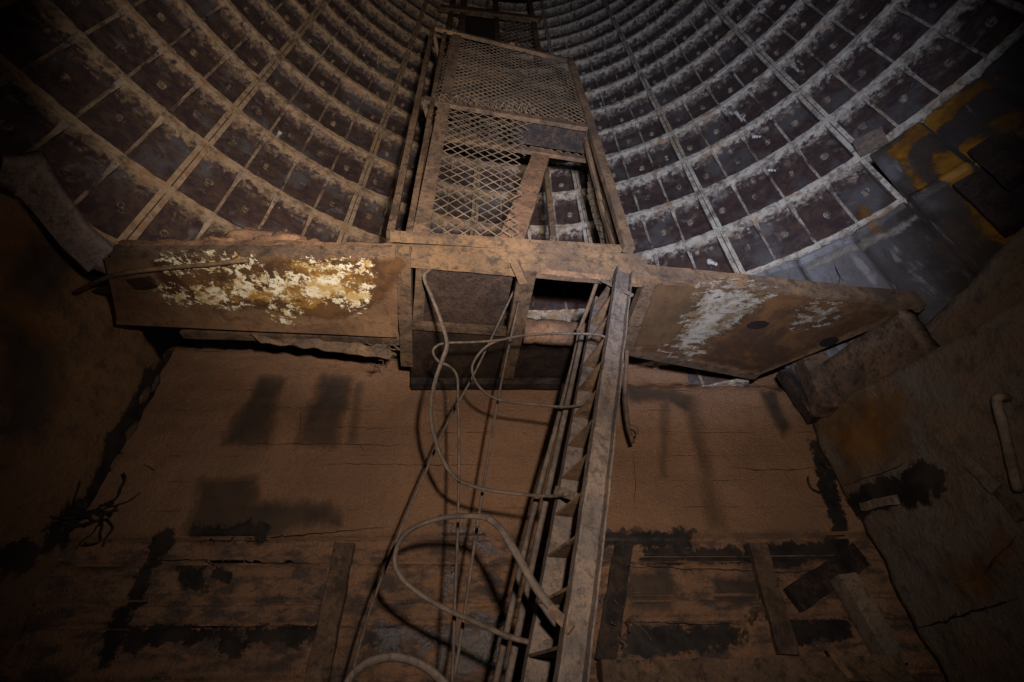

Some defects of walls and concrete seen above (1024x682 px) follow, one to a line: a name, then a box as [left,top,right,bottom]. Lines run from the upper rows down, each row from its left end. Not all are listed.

rust [887,71,1000,190]
rust [932,111,1024,186]
peeling [153,250,377,326]